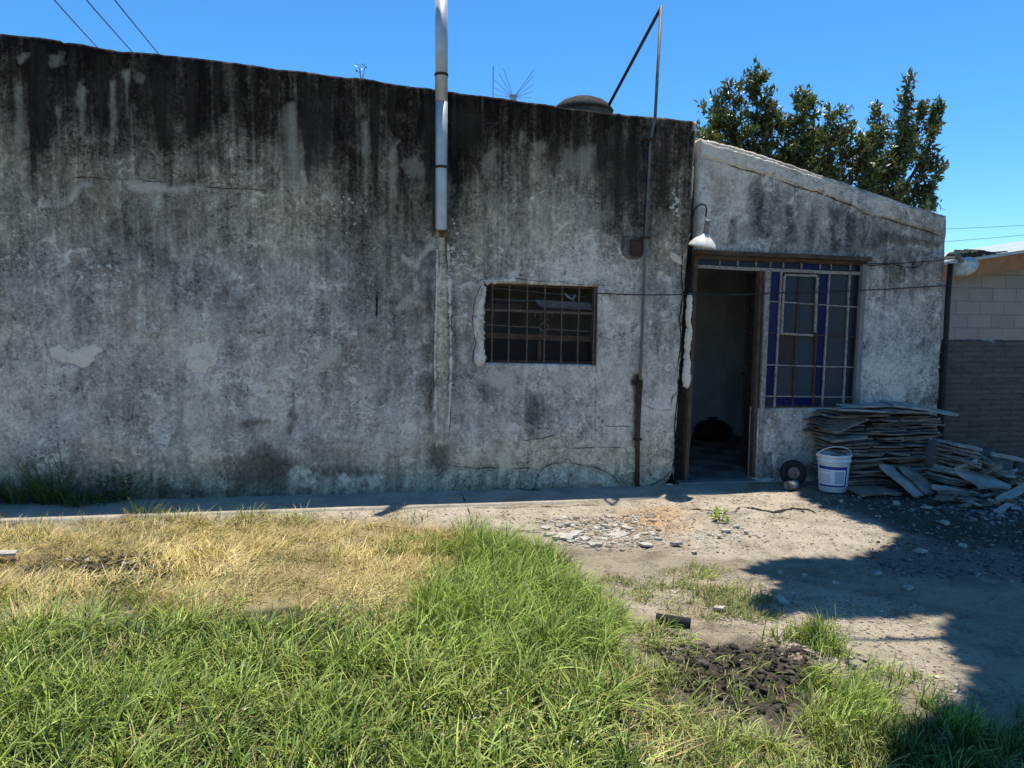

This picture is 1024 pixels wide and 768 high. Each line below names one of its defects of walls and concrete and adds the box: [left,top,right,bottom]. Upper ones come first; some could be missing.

damp [126,181,202,209]
crack [713,160,946,268]
corrosion [631,374,639,447]
crack [452,425,630,533]